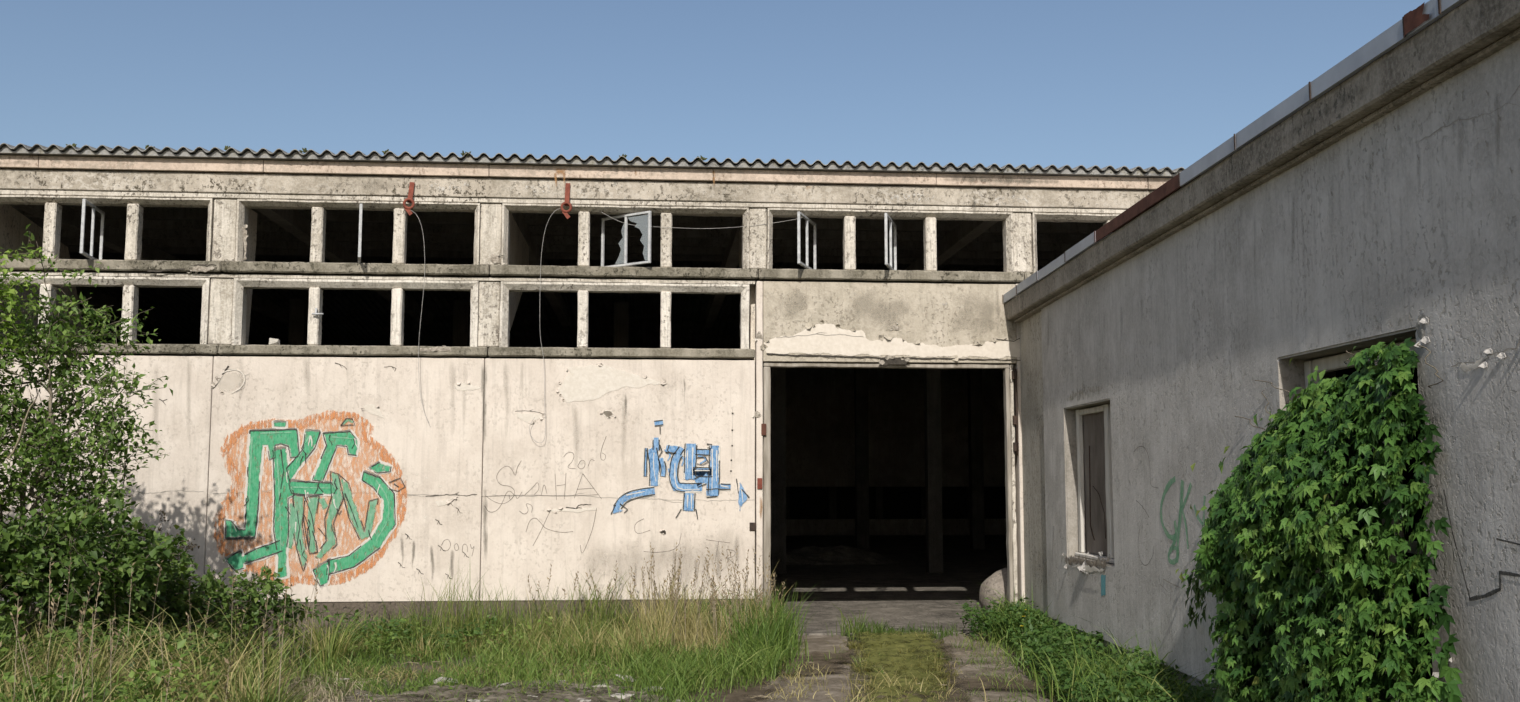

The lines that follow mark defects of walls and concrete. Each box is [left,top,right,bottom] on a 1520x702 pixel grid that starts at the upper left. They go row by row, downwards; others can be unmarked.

peeling [755,320,1020,365]
crack [1451,337,1520,372]